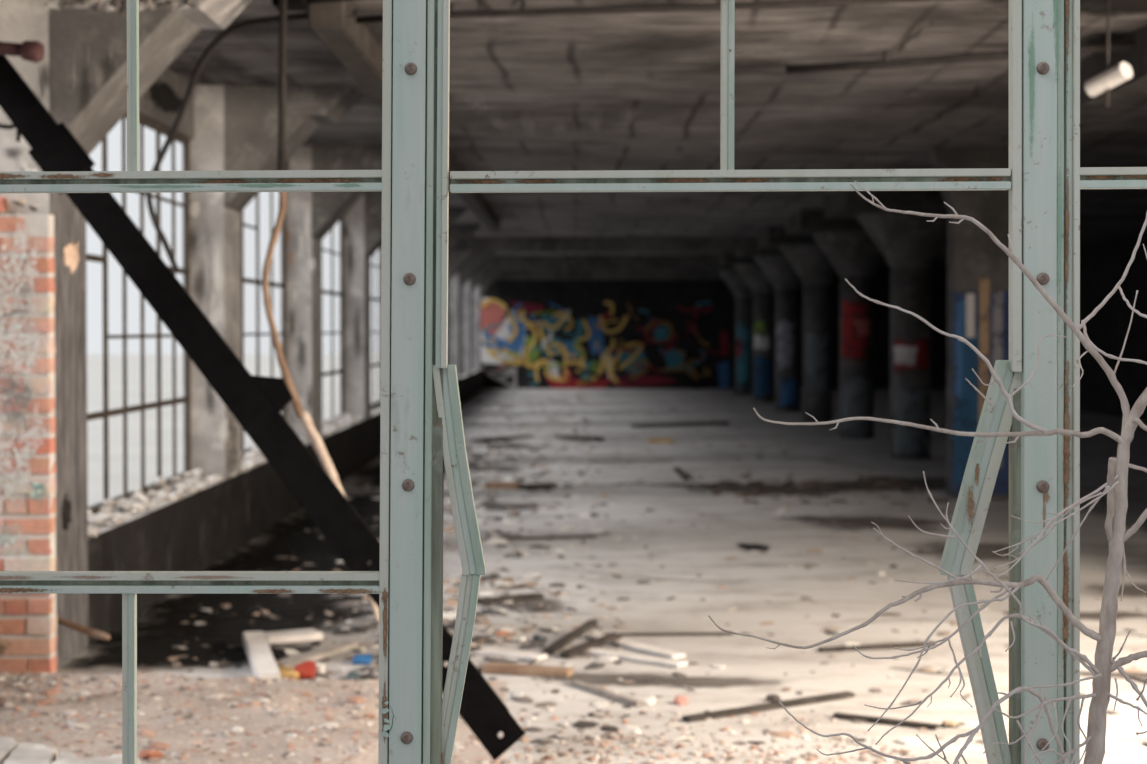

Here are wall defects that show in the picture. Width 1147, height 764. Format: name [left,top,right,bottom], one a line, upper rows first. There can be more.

peeling [0,197,51,501]
corrosion [1063,361,1071,520]
corrosion [967,464,980,524]
corrosion [0,576,47,593]
corrosion [320,589,389,659]